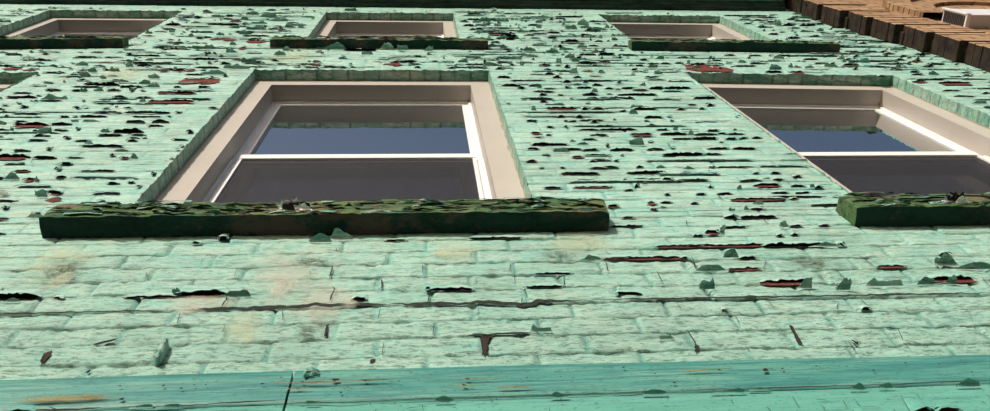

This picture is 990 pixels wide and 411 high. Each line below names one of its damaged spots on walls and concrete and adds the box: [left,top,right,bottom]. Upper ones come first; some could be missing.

peeling [0,7,990,290]
peeling [122,285,251,298]
peeling [956,378,980,387]
peeling [902,396,963,411]